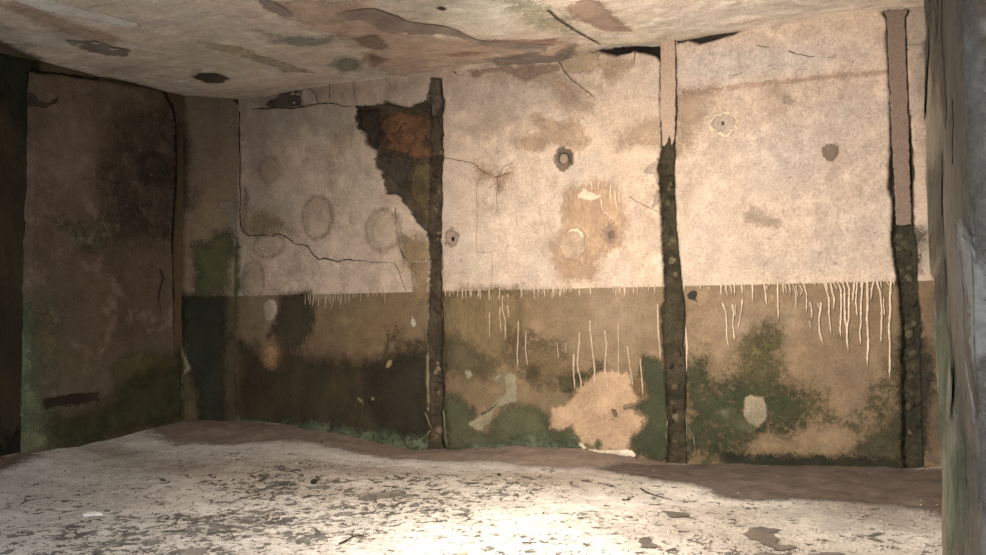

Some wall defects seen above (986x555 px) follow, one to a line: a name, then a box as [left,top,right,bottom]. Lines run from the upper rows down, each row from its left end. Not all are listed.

peeling [15,0,139,28]
spalling [65,40,130,57]
spalling [259,0,292,17]
peeling [267,90,305,108]
leakage [0,95,28,457]
crack [236,82,429,295]
spalling [355,93,444,233]
leakage [520,180,627,299]
leakage [235,235,496,450]
leakage [445,288,643,395]
leakage [700,281,903,421]
peeling [549,370,645,457]